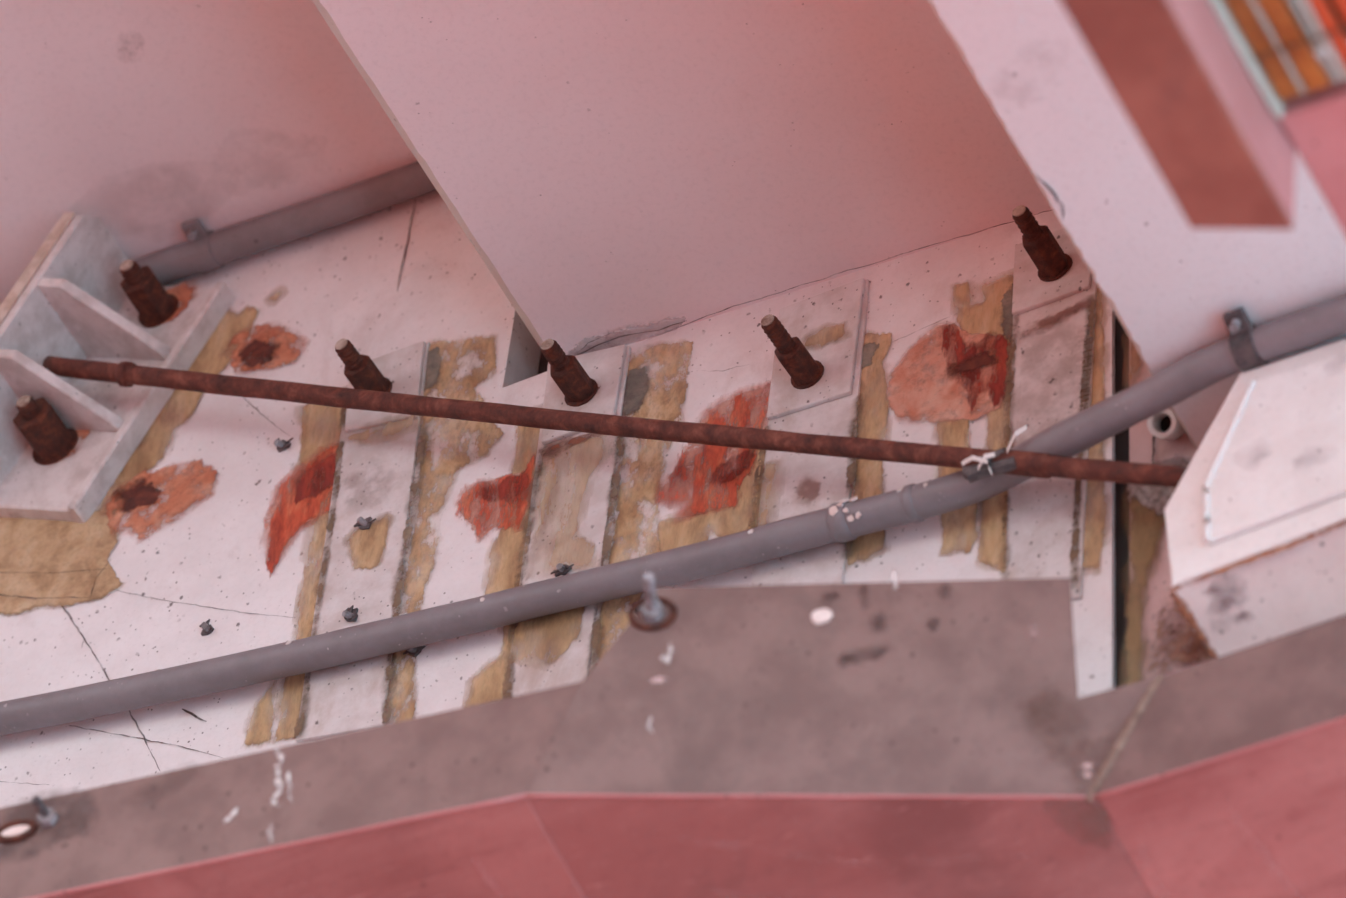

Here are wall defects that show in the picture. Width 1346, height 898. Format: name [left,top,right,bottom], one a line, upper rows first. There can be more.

corrosion [228,323,304,372]
peeling [569,317,685,356]
corrosion [701,383,770,429]
corrosion [887,324,1010,422]
corrosion [105,459,218,540]
corrosion [264,445,338,576]
corrosion [456,433,595,537]
corrosion [657,443,757,517]
crack [0,559,295,680]
peeling [811,608,833,625]
corrosion [1147,520,1346,674]
crack [69,709,222,771]